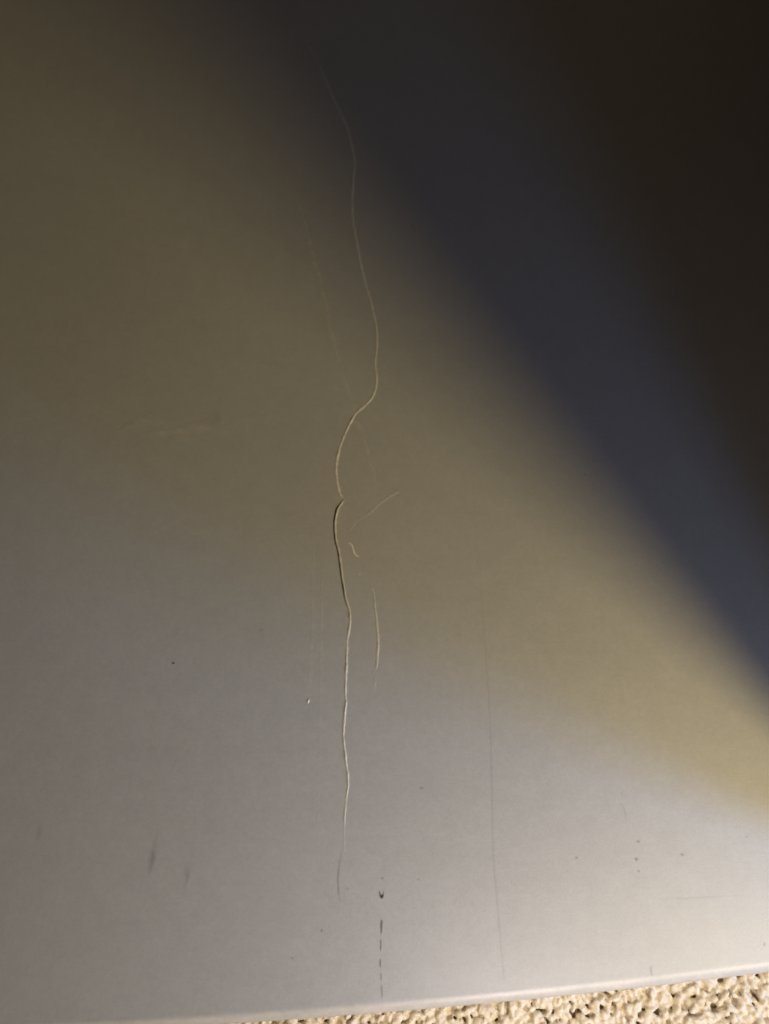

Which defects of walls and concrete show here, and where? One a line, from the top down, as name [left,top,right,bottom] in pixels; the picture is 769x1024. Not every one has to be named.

crack [318,63,378,809]